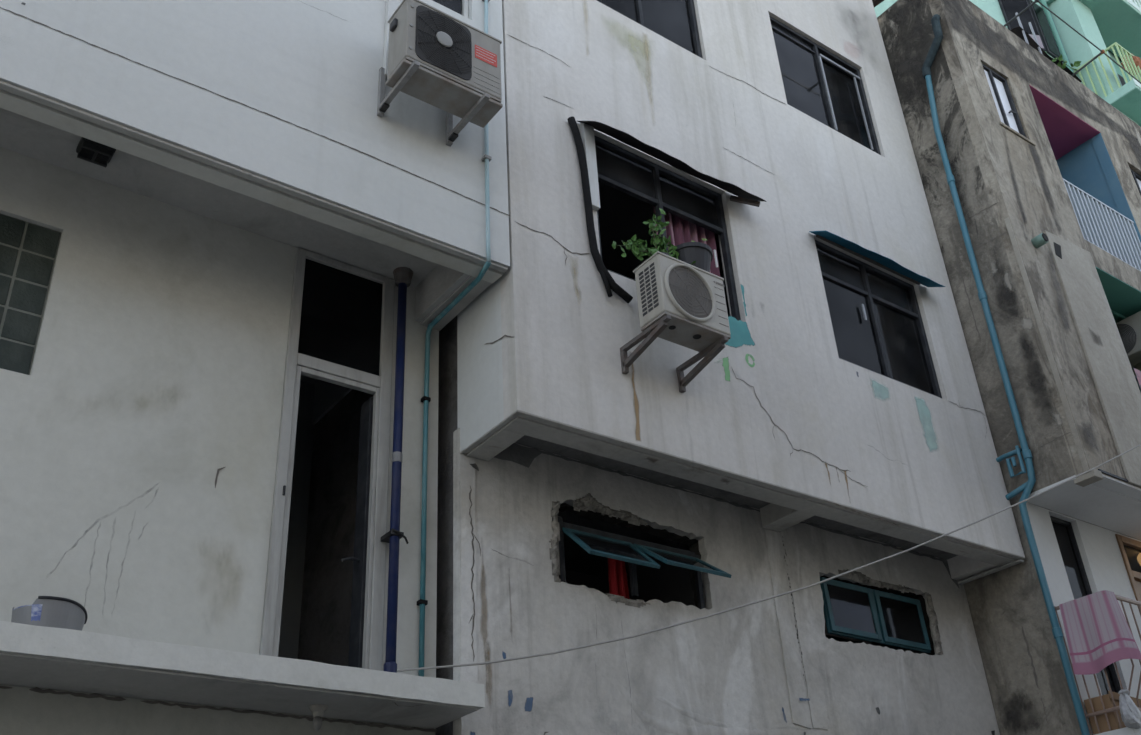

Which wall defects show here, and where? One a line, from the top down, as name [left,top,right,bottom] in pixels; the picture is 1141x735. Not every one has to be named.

leakage [946,0,1141,165]
crack [0,7,590,265]
leakage [950,163,968,215]
leakage [1029,145,1053,207]
leakage [991,262,1062,425]
corrosion [632,364,640,440]
crack [732,369,868,487]
crack [469,486,481,662]
flaking render [549,493,648,583]
flaking render [606,593,650,608]
flaking render [838,569,943,655]